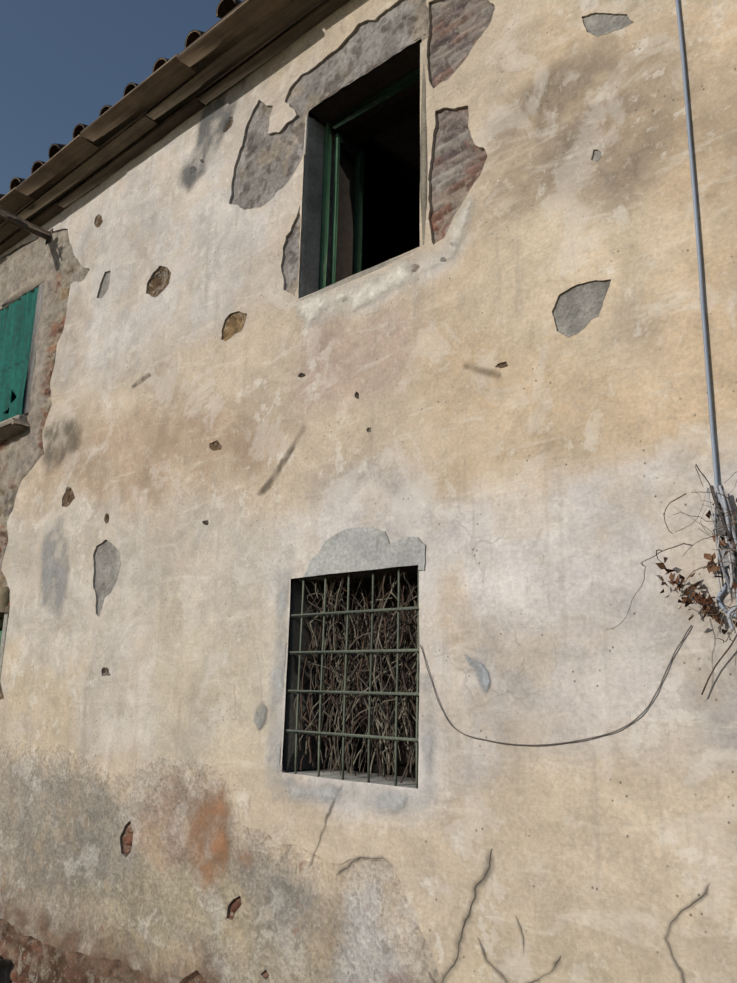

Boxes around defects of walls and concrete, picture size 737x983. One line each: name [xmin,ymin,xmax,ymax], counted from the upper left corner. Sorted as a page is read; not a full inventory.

peeling [229,0,495,210]
peeling [428,105,487,246]
spalling [146,266,171,298]
spalling [221,311,247,341]
peeling [552,279,611,338]
peeling [93,540,121,617]
peeling [0,737,442,983]
crack [337,857,397,875]
crack [429,849,561,983]
crack [665,882,711,983]